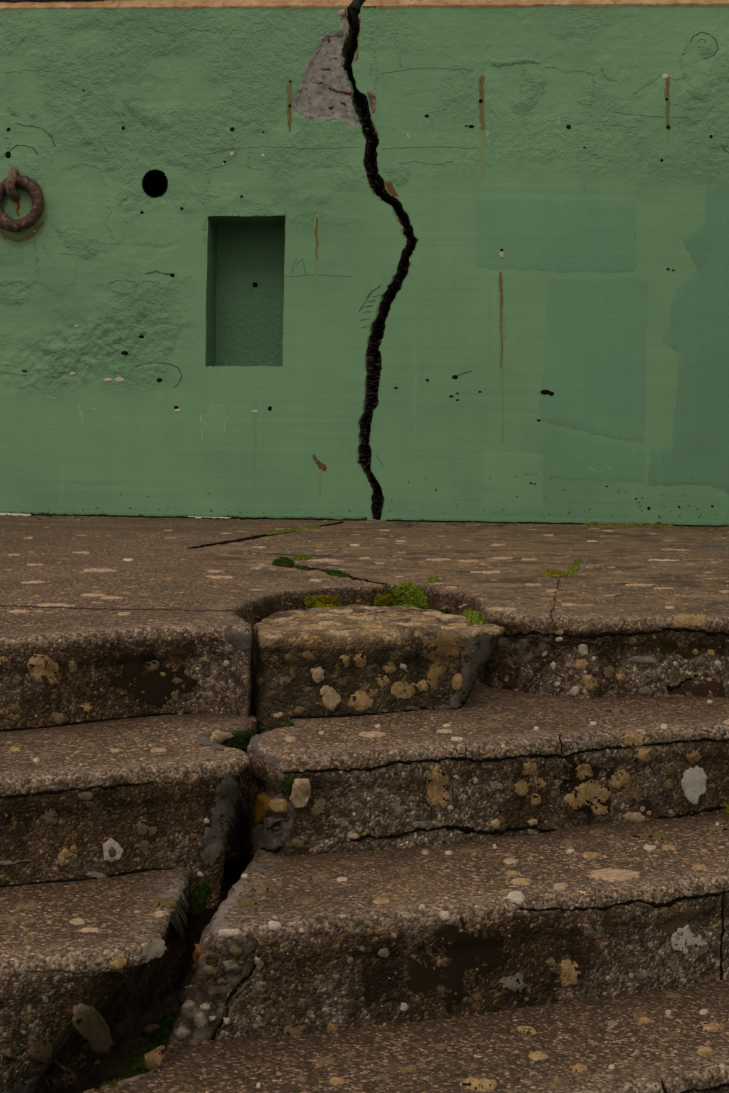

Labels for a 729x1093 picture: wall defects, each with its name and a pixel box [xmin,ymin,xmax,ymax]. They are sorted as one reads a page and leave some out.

spalling [288,9,362,126]
rust [478,74,487,130]
rust [0,188,49,248]
crack [201,0,472,520]
crack [188,521,387,585]
crack [25,968,113,976]
crack [211,954,261,1040]
crack [84,1069,160,1093]